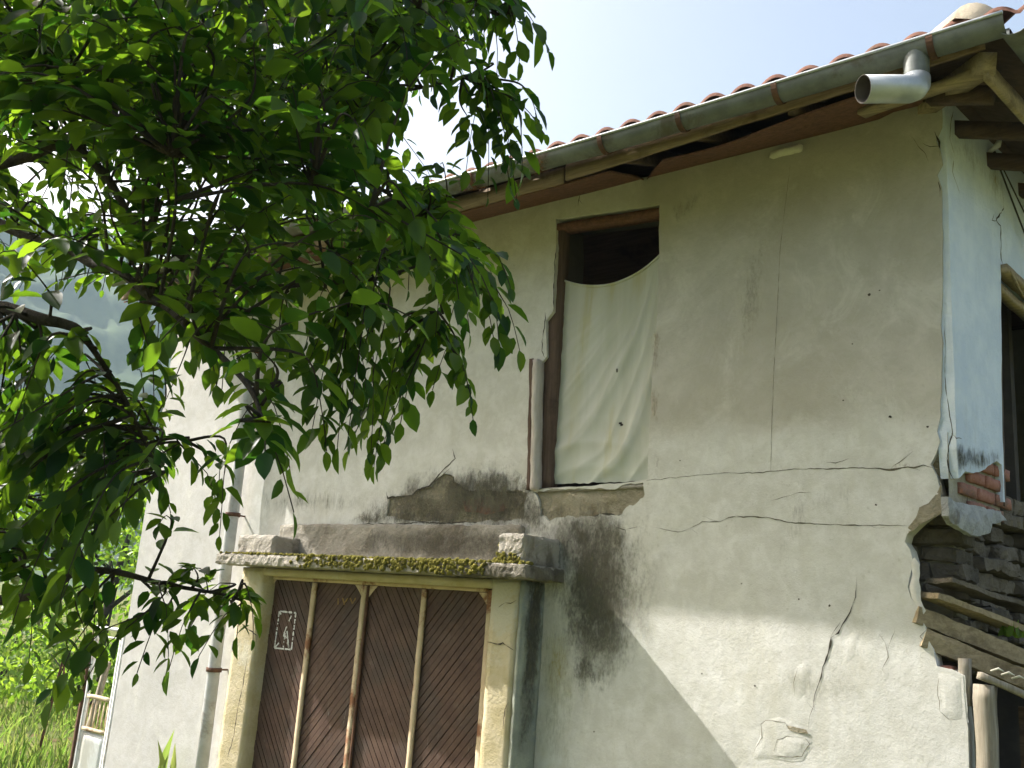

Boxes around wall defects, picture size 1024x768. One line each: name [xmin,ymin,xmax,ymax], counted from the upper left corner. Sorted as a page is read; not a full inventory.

crack [615,170,961,532]
peeling [387,474,645,523]
spalling [908,453,1012,533]
water stain [958,448,995,468]
water stain [567,522,621,651]
flaking render [909,557,926,614]
crack [807,582,857,718]